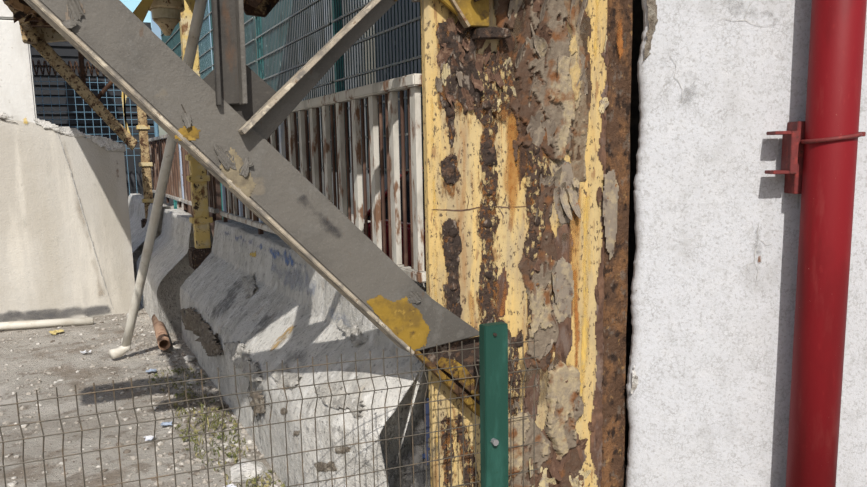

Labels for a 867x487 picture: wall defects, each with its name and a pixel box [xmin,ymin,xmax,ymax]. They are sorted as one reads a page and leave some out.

flaking render [643,0,658,61]
spalling [33,118,126,152]
rust [435,17,623,487]
peeling [493,0,600,487]
peeling [603,170,619,260]
water stain [0,306,110,321]
spalling [180,307,302,417]